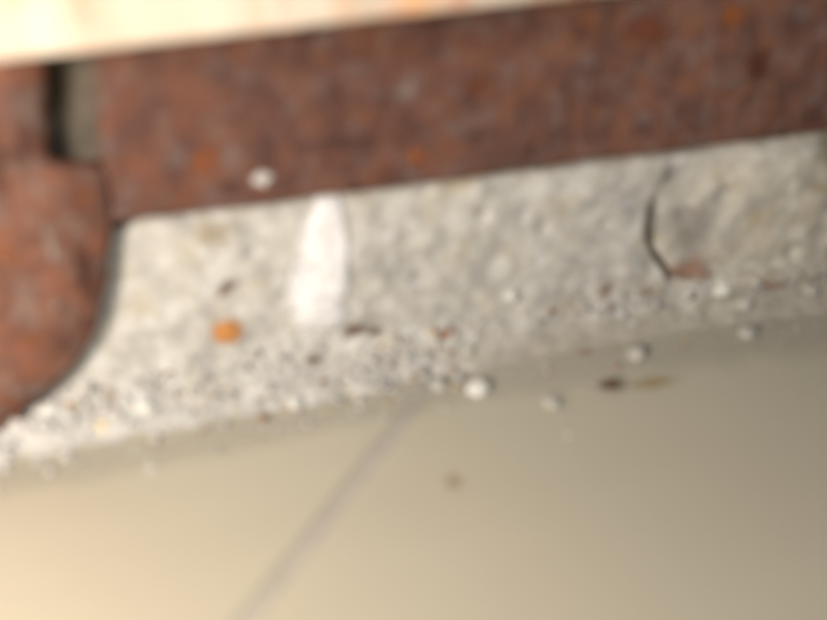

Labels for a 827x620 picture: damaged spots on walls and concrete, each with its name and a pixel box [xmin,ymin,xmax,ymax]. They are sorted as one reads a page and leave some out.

crack [645,201,687,282]
damp [288,193,348,328]
corrosion [220,282,234,295]
corrosion [213,320,240,343]
corrosion [346,326,378,335]
corrosion [602,379,620,389]